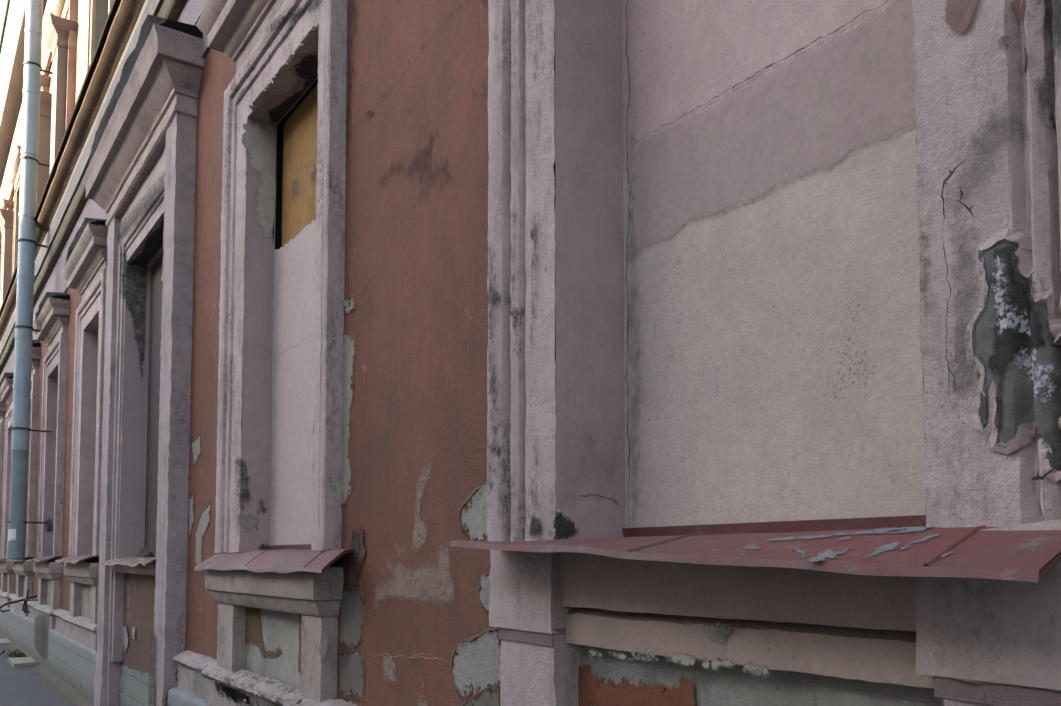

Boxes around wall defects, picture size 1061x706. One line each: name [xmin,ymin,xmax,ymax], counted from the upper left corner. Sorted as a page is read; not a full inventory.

water stain [1043,0,1061,54]
flaking render [241,26,318,238]
water stain [117,173,165,239]
water stain [120,217,164,376]
crack [941,160,975,400]
spalling [964,229,1061,482]
flaking render [188,492,212,577]
water stain [236,458,266,513]
peeling [749,526,939,562]
peeling [319,527,456,703]
flaking render [450,567,501,706]
peeling [578,622,771,706]